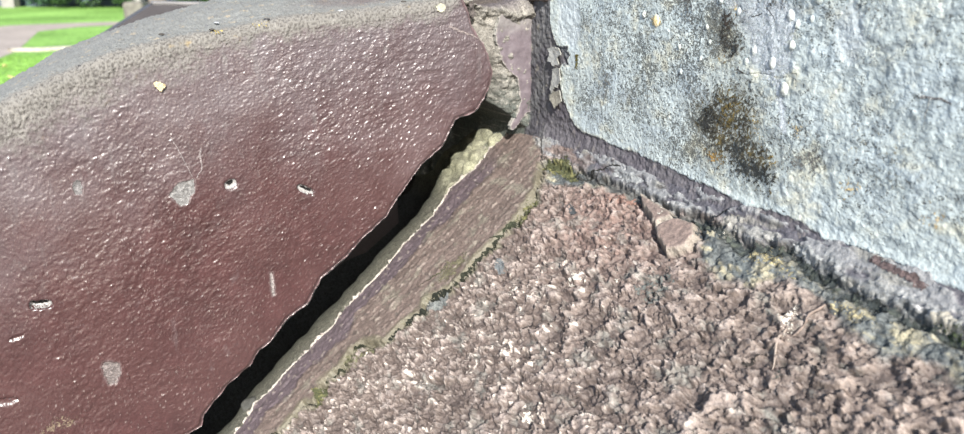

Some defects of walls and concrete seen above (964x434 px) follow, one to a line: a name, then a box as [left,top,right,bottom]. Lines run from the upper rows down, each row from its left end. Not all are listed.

peeling [169,179,195,206]
crack [189,127,503,434]
crack [326,194,537,384]
spalling [413,0,536,176]
peeling [547,45,570,109]
water stain [687,8,830,198]